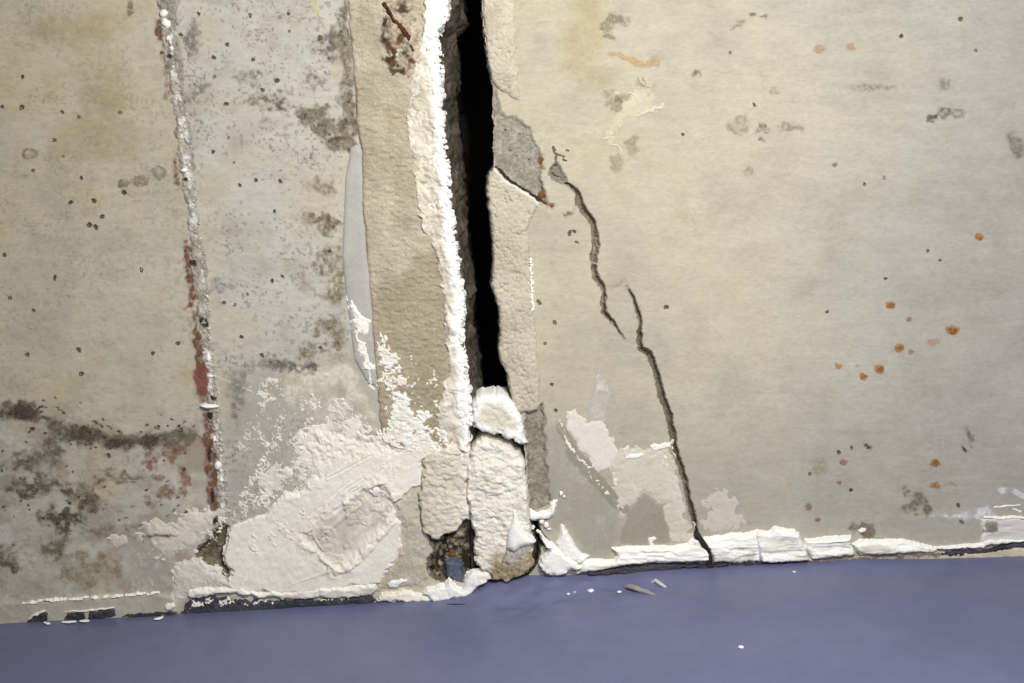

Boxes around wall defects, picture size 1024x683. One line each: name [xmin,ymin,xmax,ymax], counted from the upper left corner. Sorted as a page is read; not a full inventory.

corrosion [184,240,218,511]
crack [439,0,525,452]
peeling [485,80,554,511]
crack [548,146,714,569]
spalling [195,522,231,577]
spalling [425,513,480,583]
crack [469,526,477,569]